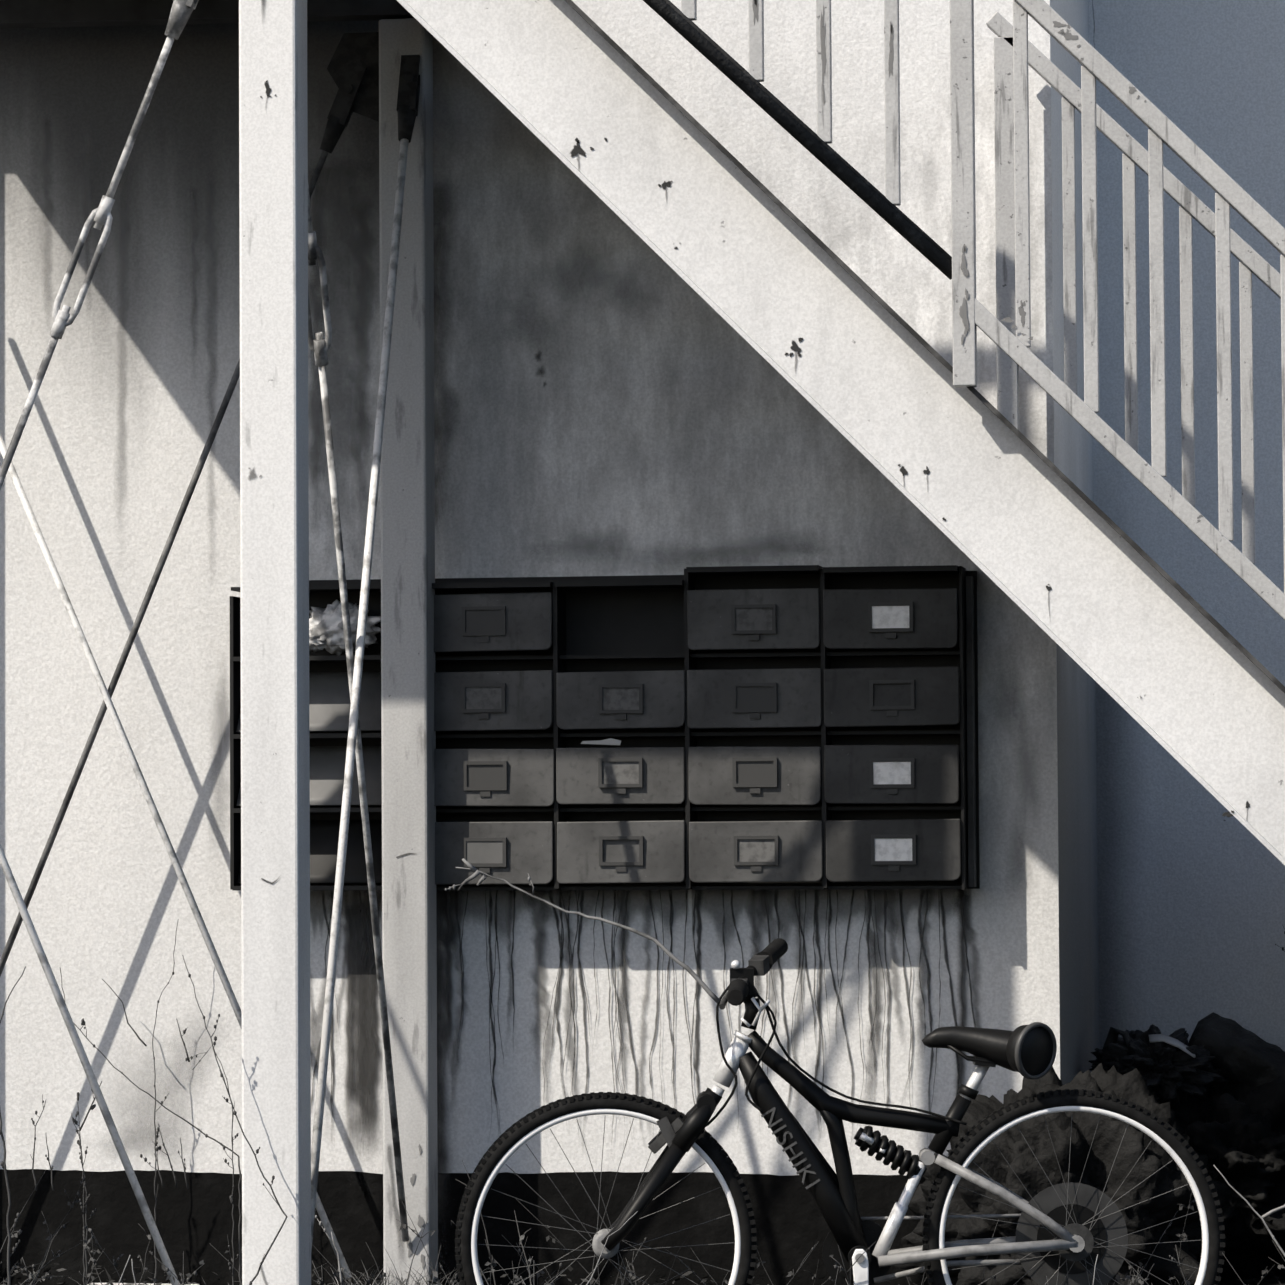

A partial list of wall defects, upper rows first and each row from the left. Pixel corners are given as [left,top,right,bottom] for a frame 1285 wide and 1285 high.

rust [570,138,607,168]
rust [785,338,803,369]
damp [311,891,380,1130]
damp [485,891,515,1105]
damp [543,891,702,1105]
damp [723,892,744,1041]
damp [761,890,976,1111]